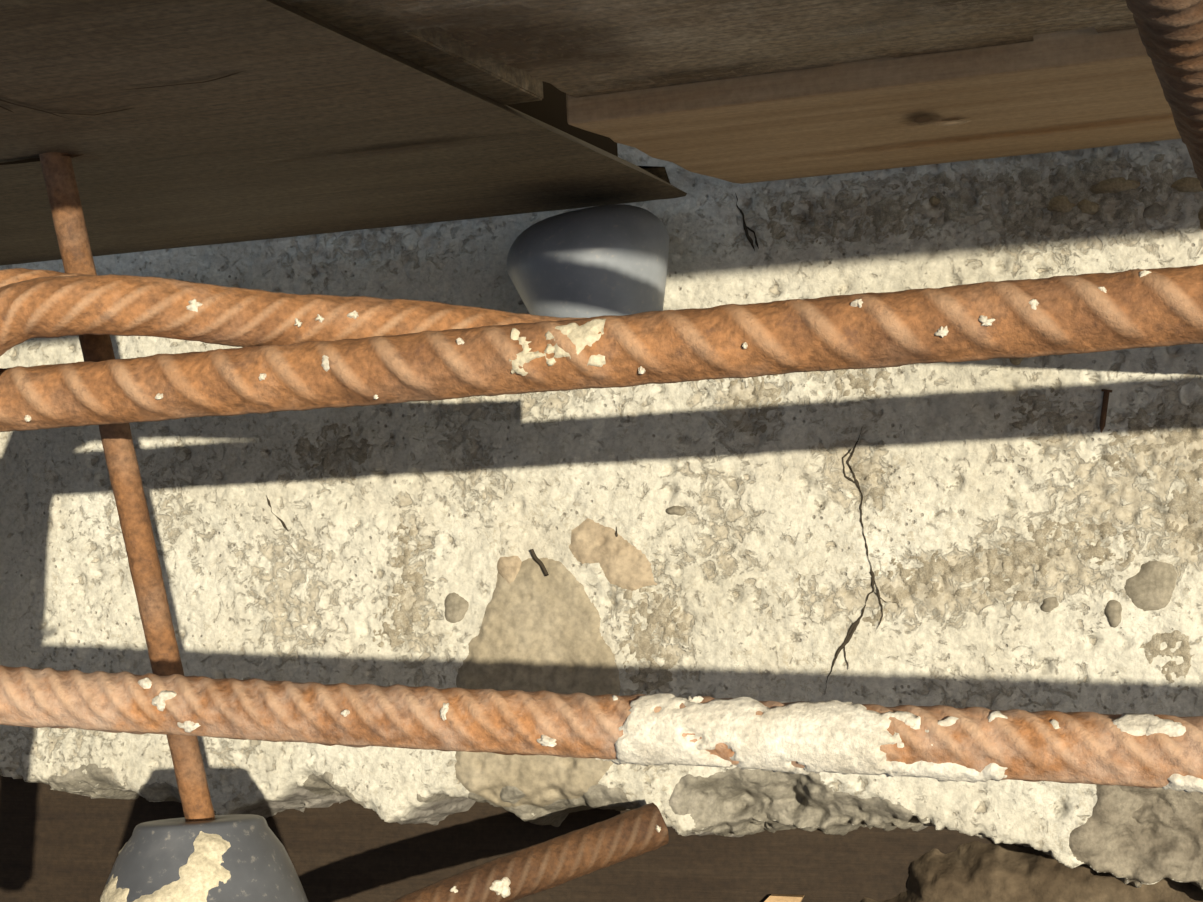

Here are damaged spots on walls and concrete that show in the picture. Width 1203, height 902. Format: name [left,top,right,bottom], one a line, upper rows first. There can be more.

crack [824,429,896,695]
peeling [456,518,657,696]
spalling [19,763,181,803]
spalling [303,772,368,809]
peeling [417,751,642,827]
spalling [667,767,931,837]
spalling [1069,784,1203,891]